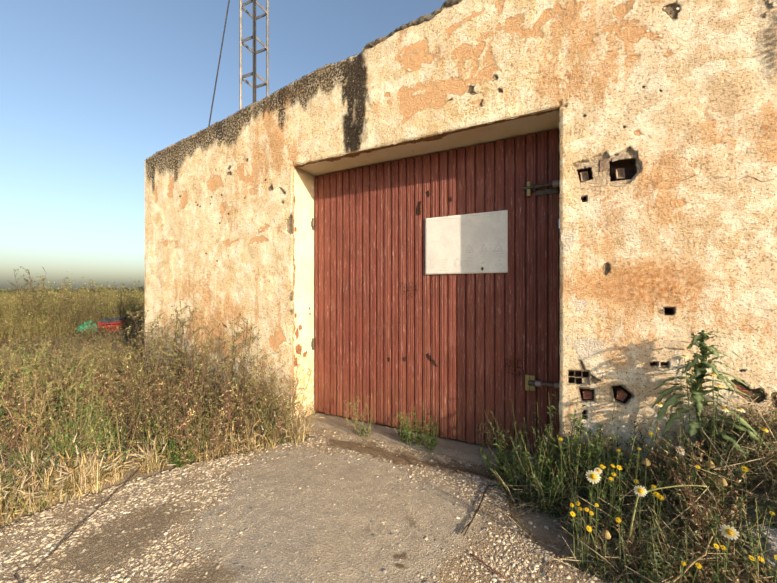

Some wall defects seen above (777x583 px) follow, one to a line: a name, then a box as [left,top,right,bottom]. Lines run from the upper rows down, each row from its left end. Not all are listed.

peeling [384,0,585,124]
peeling [167,158,255,224]
damp [146,52,369,190]
spalling [293,107,559,169]
spalling [572,147,642,187]
peeling [222,179,307,383]
spalling [567,359,635,419]
flaking render [731,369,777,410]